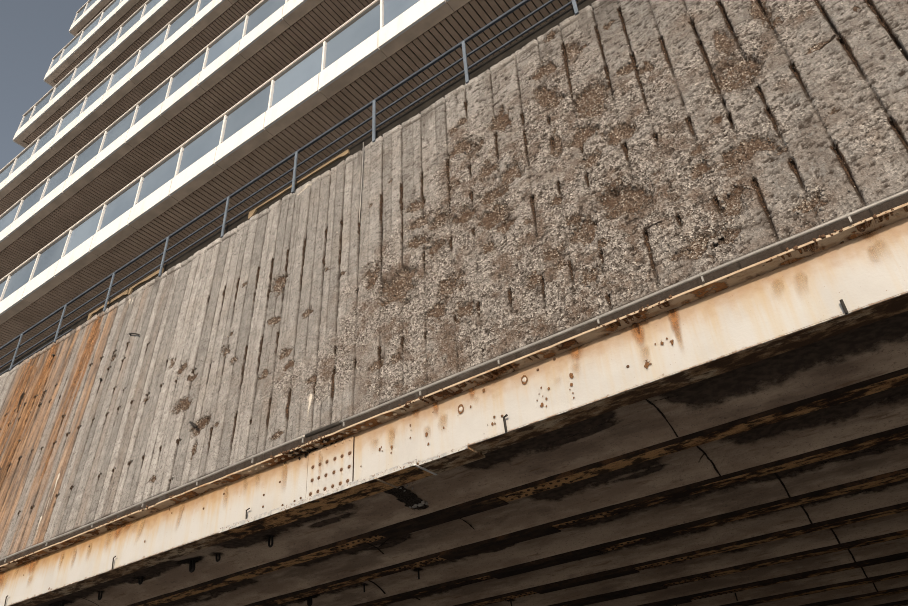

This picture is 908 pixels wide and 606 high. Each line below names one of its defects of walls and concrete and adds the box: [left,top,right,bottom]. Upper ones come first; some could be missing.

corrosion [604,277,729,345]
water stain [660,311,908,408]
corrosion [260,339,581,467]
water stain [463,411,615,469]
crack [645,395,721,476]
water stain [213,503,354,548]
spalling [383,485,429,510]
water stain [529,456,666,501]
water stain [568,438,908,528]
crack [774,473,878,592]
water stain [35,560,181,606]
water stain [158,579,258,606]